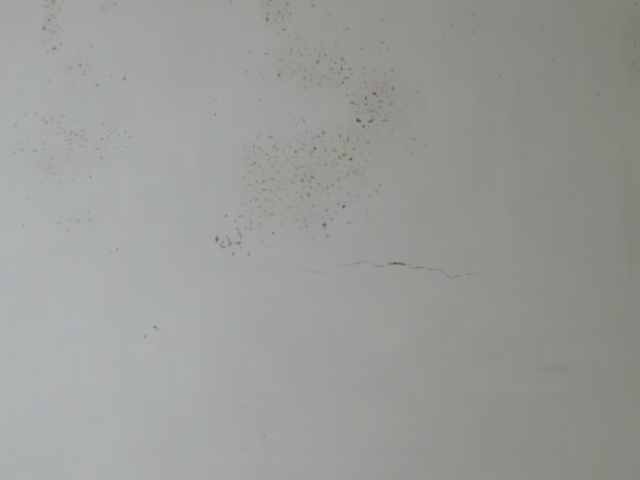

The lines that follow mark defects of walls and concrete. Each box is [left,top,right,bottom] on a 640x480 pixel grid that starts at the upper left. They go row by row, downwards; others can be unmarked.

damp [213,0,437,256]
crack [288,261,484,279]